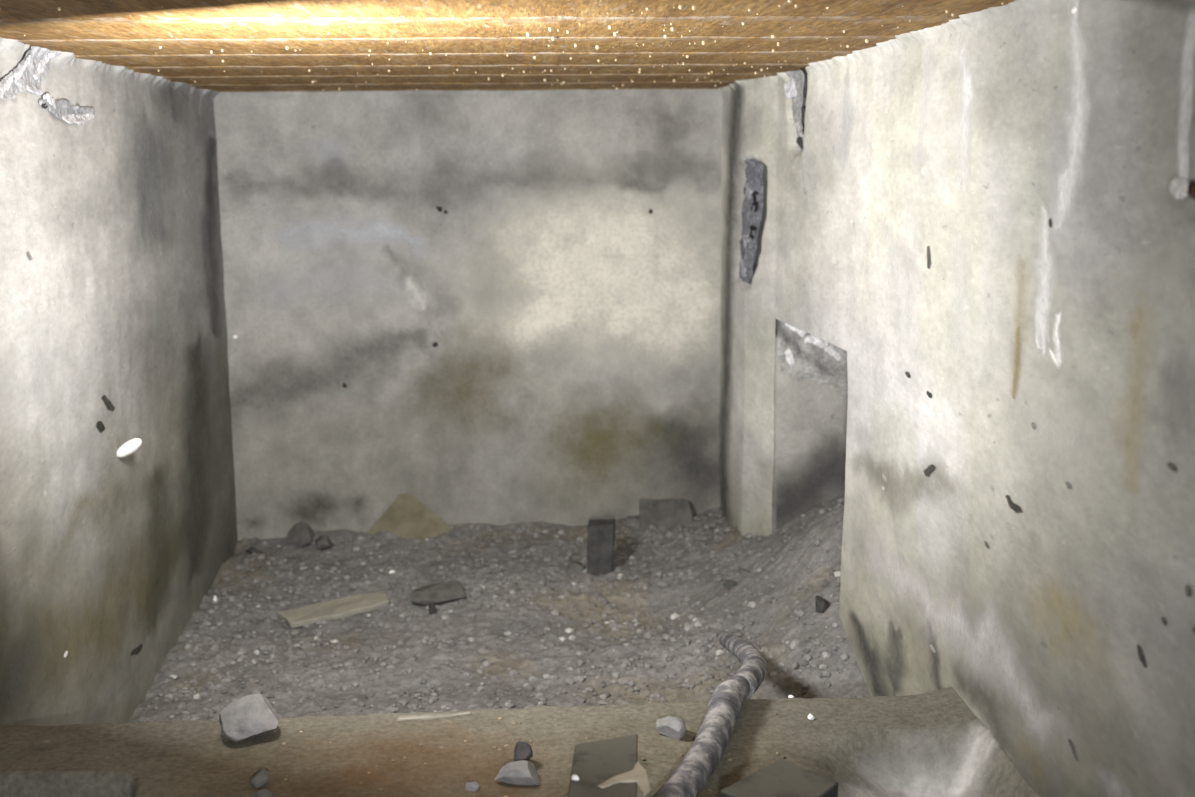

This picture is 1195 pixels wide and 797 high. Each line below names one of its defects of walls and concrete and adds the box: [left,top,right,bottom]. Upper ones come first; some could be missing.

spalling [0,46,95,124]
spalling [739,159,764,285]
water stain [1036,0,1086,366]